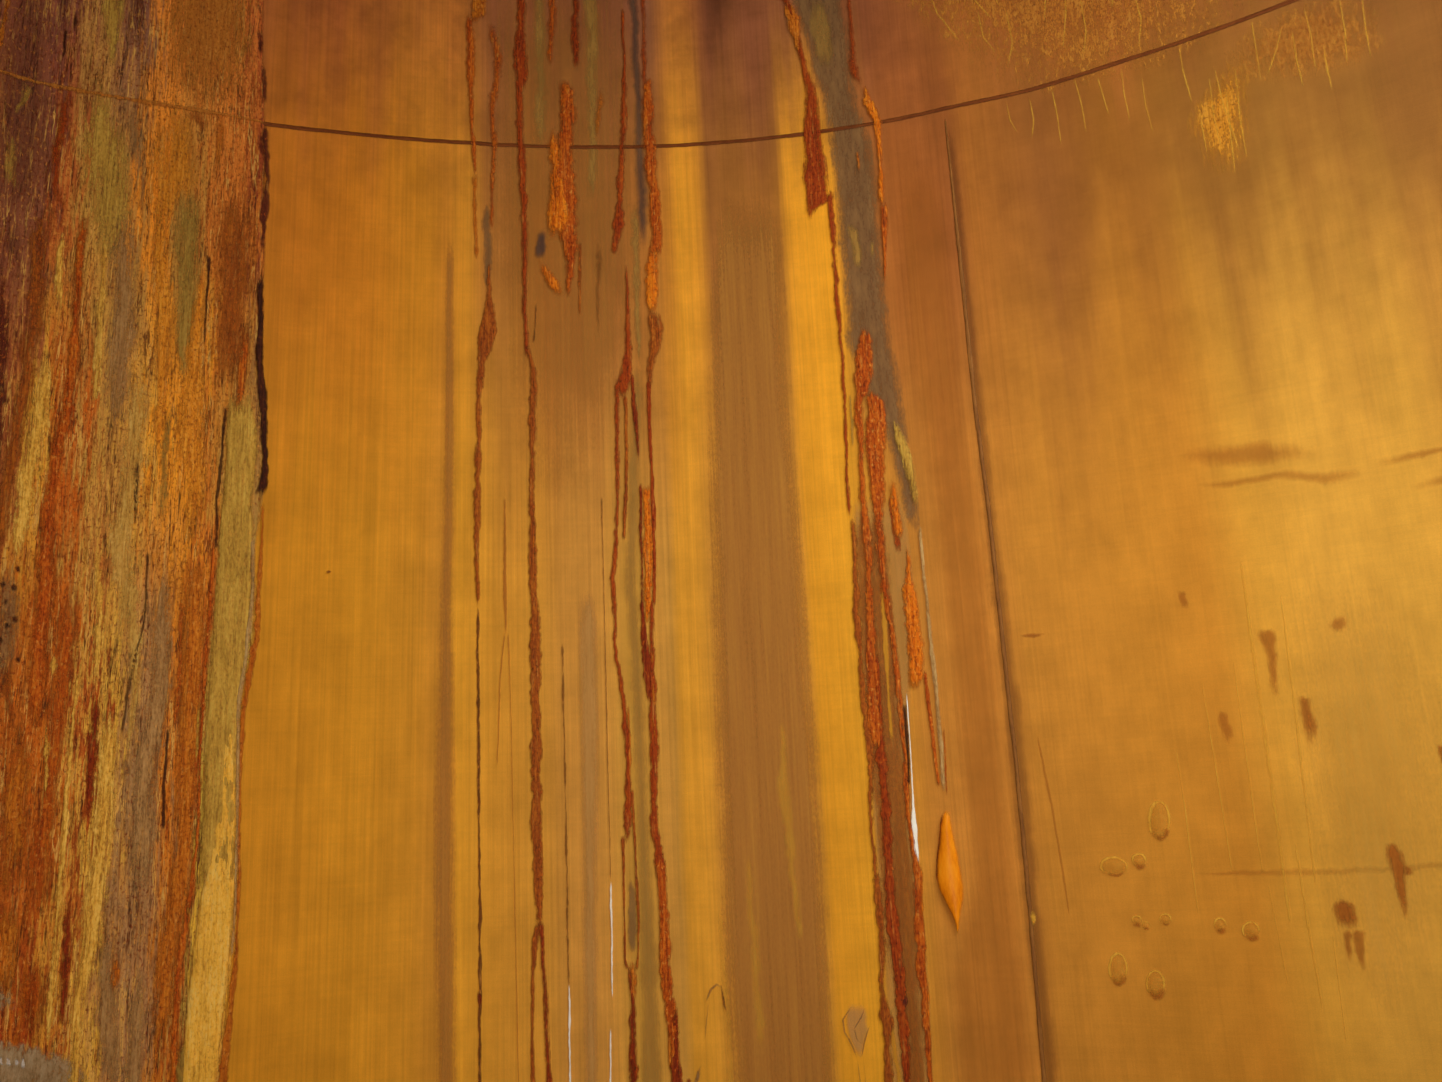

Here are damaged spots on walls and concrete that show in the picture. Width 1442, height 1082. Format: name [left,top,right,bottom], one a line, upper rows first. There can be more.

rust [0,0,270,1082]
rust [466,0,552,1082]
rust [610,0,691,1082]
damp [711,212,832,1082]
rust [783,0,940,1082]
rust [1302,699,1316,730]
rust [1336,902,1362,956]
rust [1388,845,1411,908]